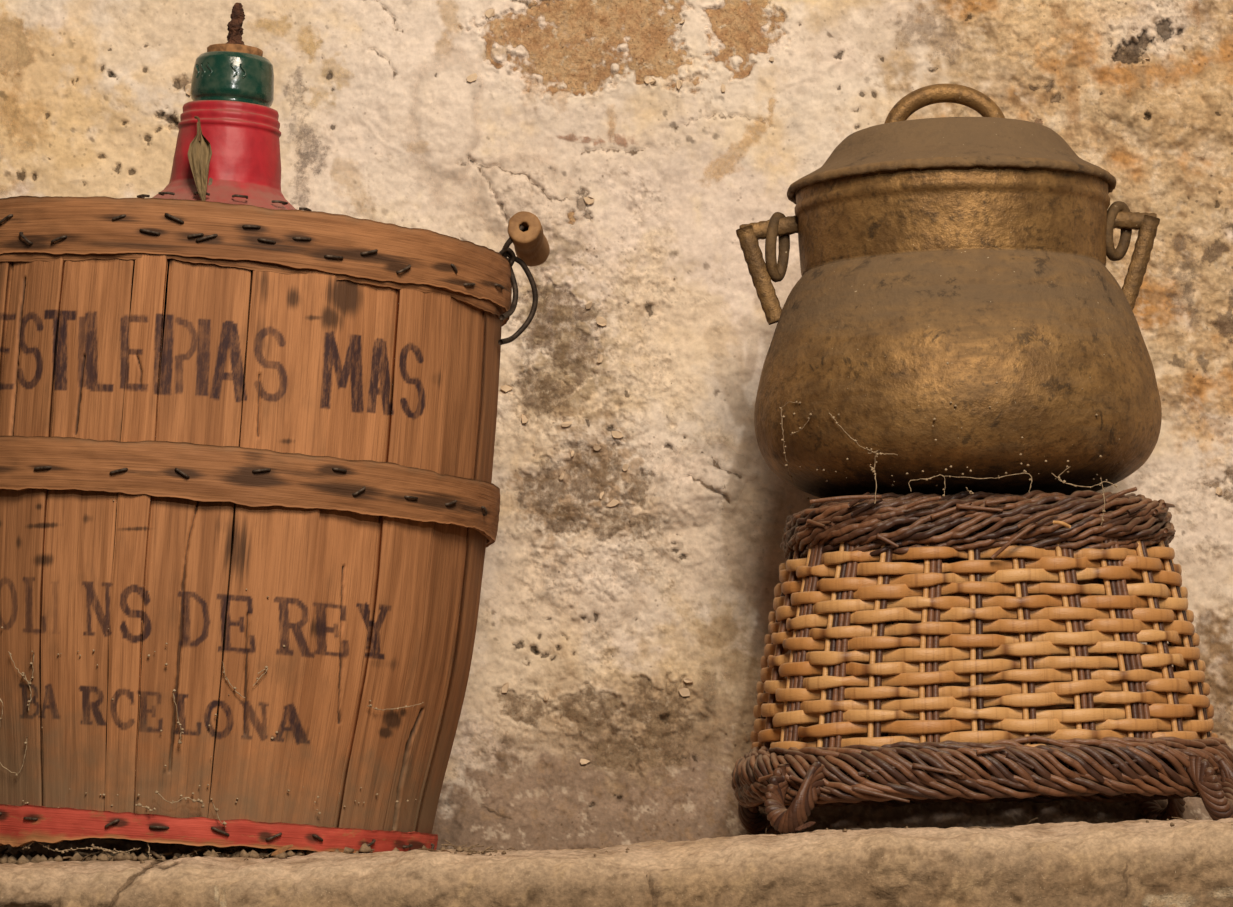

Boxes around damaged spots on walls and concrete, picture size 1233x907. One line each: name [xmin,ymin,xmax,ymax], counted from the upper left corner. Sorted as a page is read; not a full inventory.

spalling [483,0,699,96]
spalling [705,0,786,92]
crack [109,861,178,907]